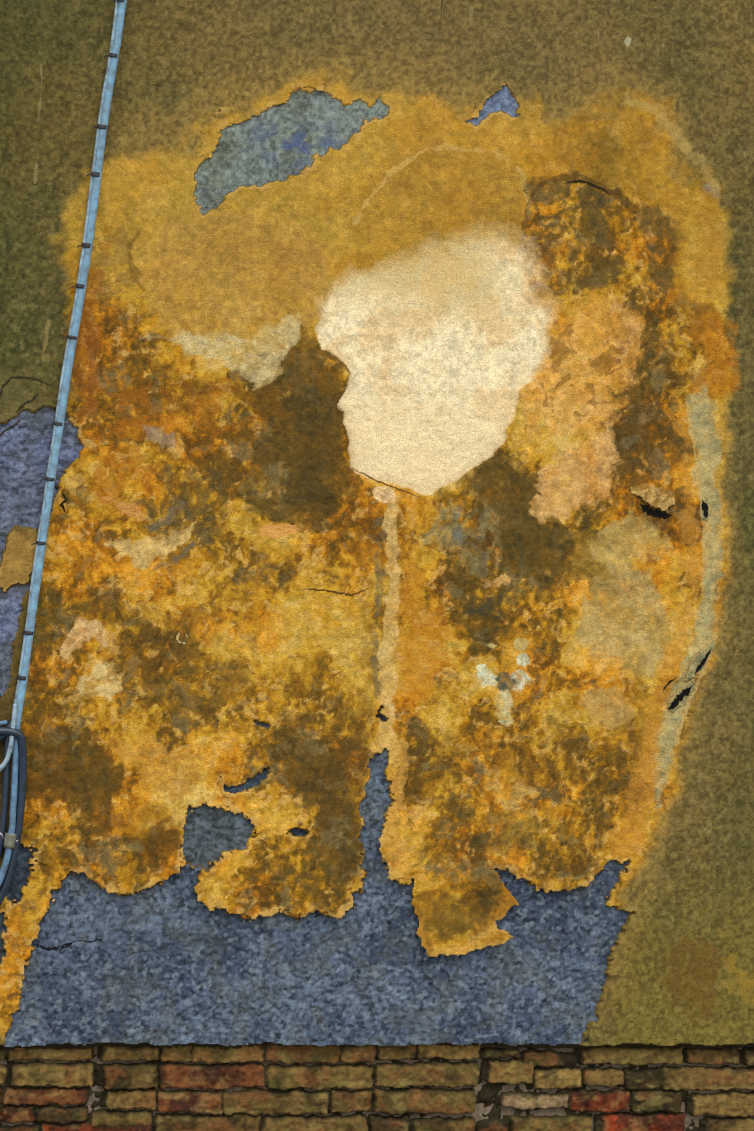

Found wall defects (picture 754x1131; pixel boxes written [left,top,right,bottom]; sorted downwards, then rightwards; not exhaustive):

leakage [90,227,149,319]
crack [0,376,57,437]
peeling [134,75,675,731]
spalling [0,407,83,697]
leakage [44,572,262,728]
leakage [99,170,707,890]
crack [640,504,672,519]
crack [663,647,712,710]
peeling [653,384,727,814]
crack [701,501,709,518]
leakage [27,697,185,860]
spalling [0,731,630,1047]